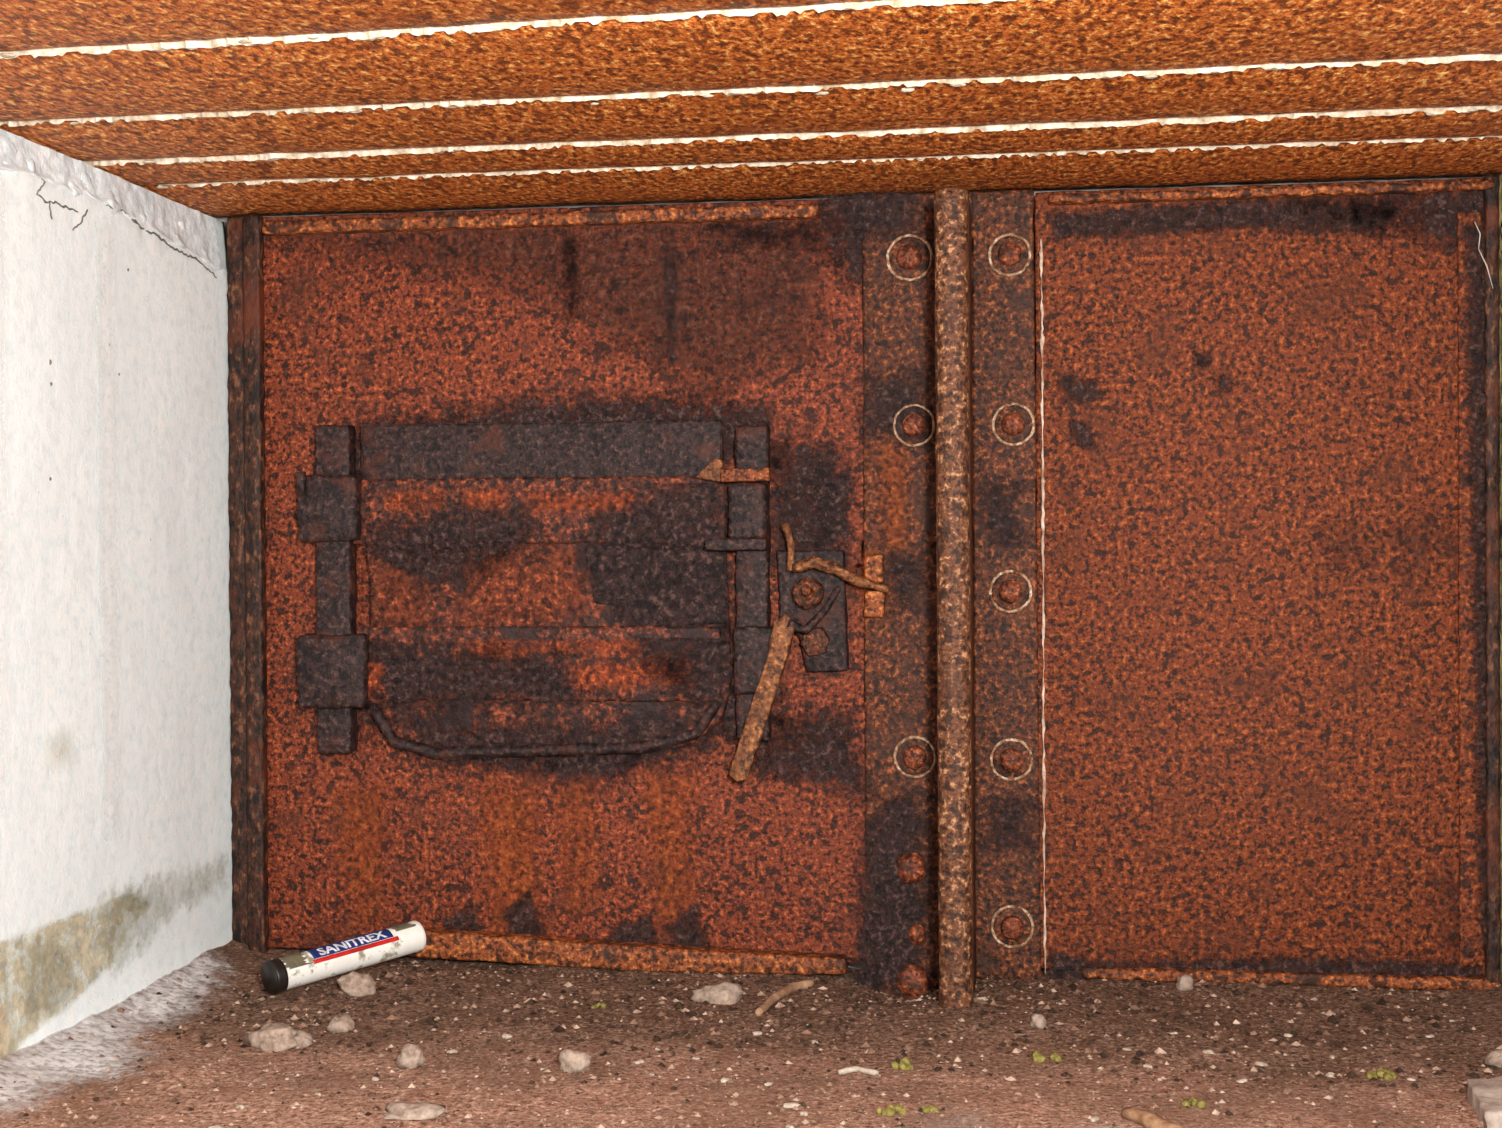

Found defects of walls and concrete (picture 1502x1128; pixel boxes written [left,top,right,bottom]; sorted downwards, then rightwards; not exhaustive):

corrosion [712,191,926,288]
corrosion [860,369,930,444]
corrosion [355,387,852,572]
corrosion [979,479,1027,551]
corrosion [1046,180,1502,945]
corrosion [357,482,738,791]
corrosion [751,684,931,996]
water stain [0,895,220,1108]
corrosion [444,905,481,931]
corrosion [503,891,542,935]
corrosion [609,905,707,947]
corrosion [1049,950,1485,981]